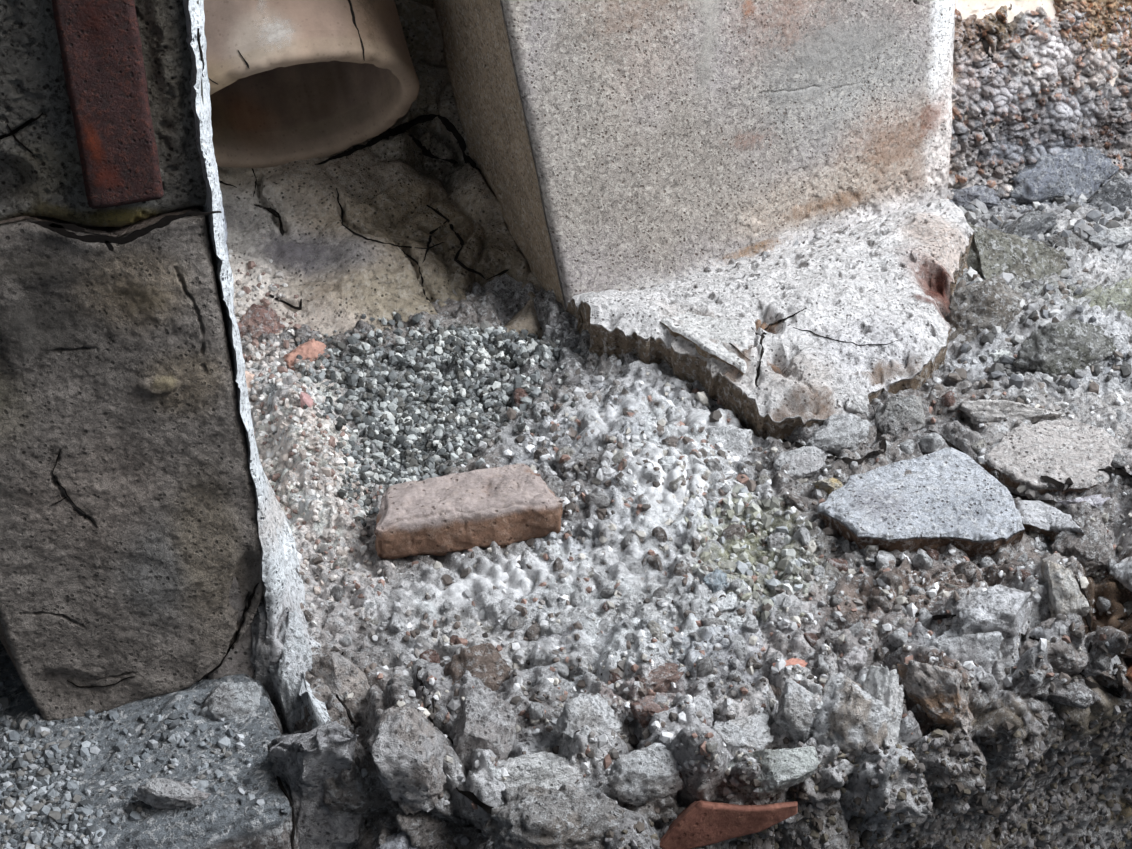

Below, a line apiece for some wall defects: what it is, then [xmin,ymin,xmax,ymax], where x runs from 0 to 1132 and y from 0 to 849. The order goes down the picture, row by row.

crack [348,0,365,61]
crack [315,114,483,177]
crack [27,168,284,251]
crack [336,188,509,302]
crack [269,294,302,310]
spalling [918,265,951,314]
peeling [660,311,778,380]
spalling [773,388,833,422]
crack [729,308,904,390]
spalling [868,364,894,384]
crack [198,583,259,682]
crack [268,745,295,849]